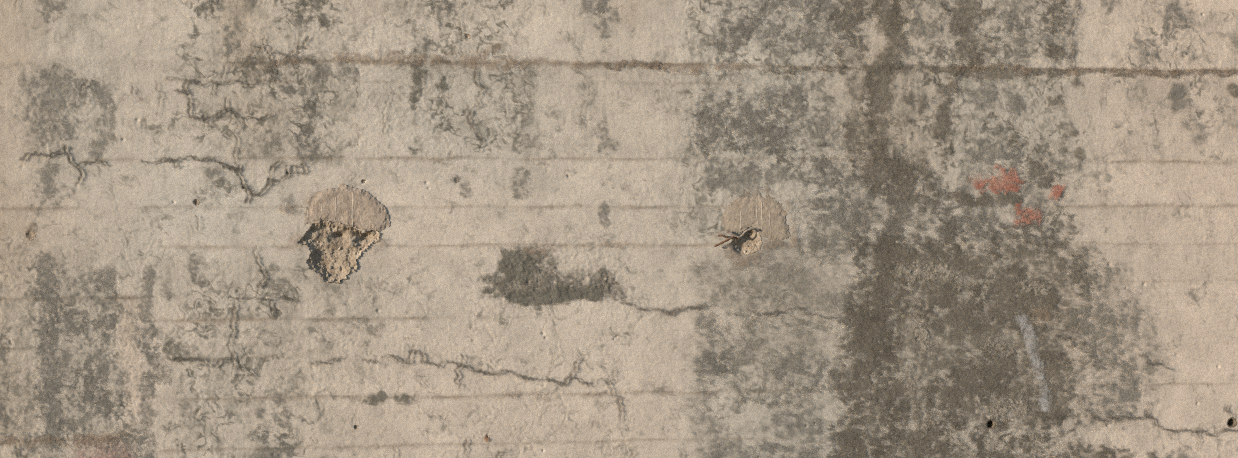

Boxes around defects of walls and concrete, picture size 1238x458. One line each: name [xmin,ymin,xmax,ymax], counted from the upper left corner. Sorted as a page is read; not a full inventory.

damp [604,60,664,70]
crack [132,36,309,203]
crack [21,145,107,184]
spalling [297,179,390,284]
spalling [714,192,790,256]
damp [691,0,1238,458]
crack [313,350,622,419]